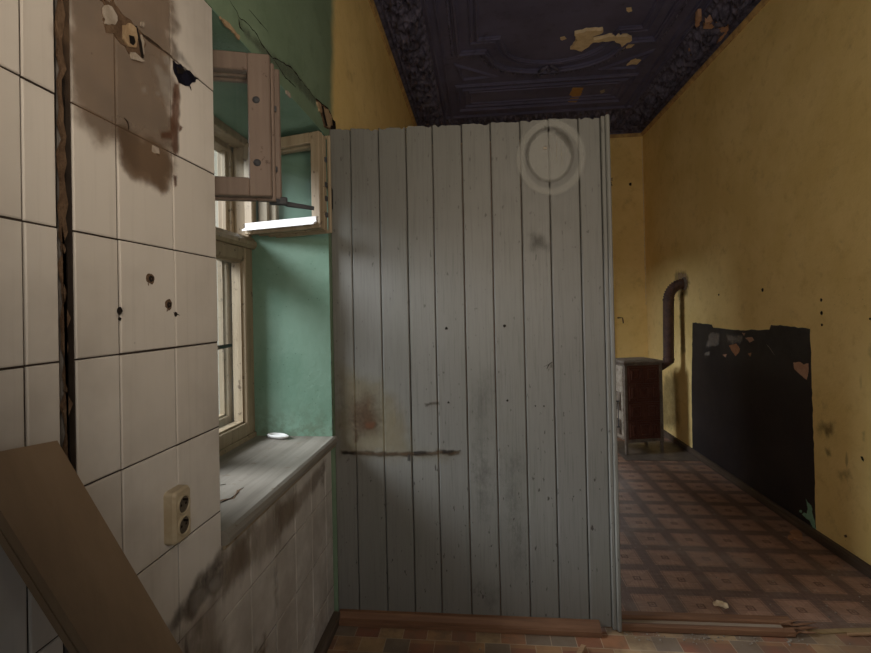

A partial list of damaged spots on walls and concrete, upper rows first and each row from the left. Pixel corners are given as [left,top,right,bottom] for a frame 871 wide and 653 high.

spalling [102,0,199,89]
crack [230,1,314,97]
peeling [560,27,634,52]
peeling [695,9,729,43]
damp [63,0,177,190]
spalling [316,98,336,129]
peeling [793,362,809,380]